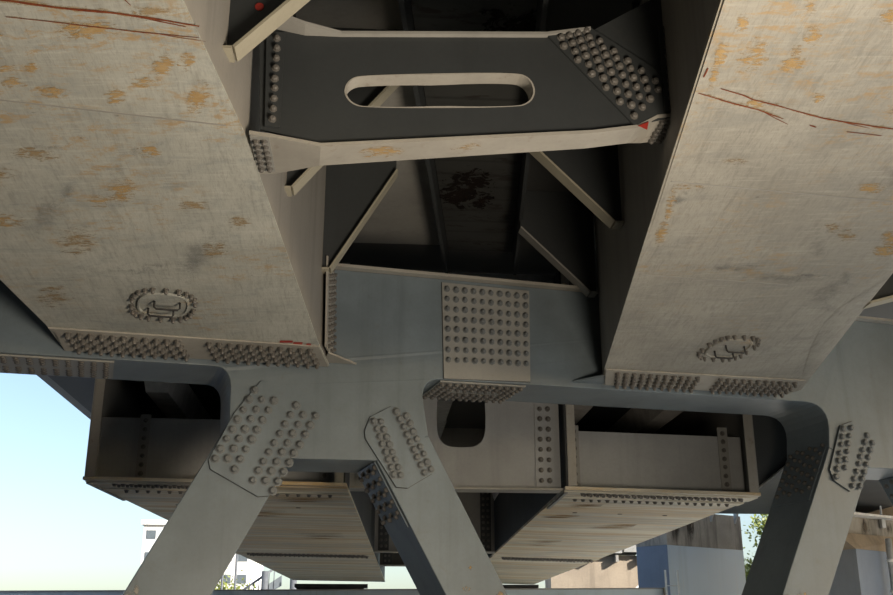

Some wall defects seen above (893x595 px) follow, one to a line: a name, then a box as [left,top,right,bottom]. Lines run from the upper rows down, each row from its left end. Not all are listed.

rust [0,0,200,41]
rust [134,53,195,88]
rust [698,44,893,136]